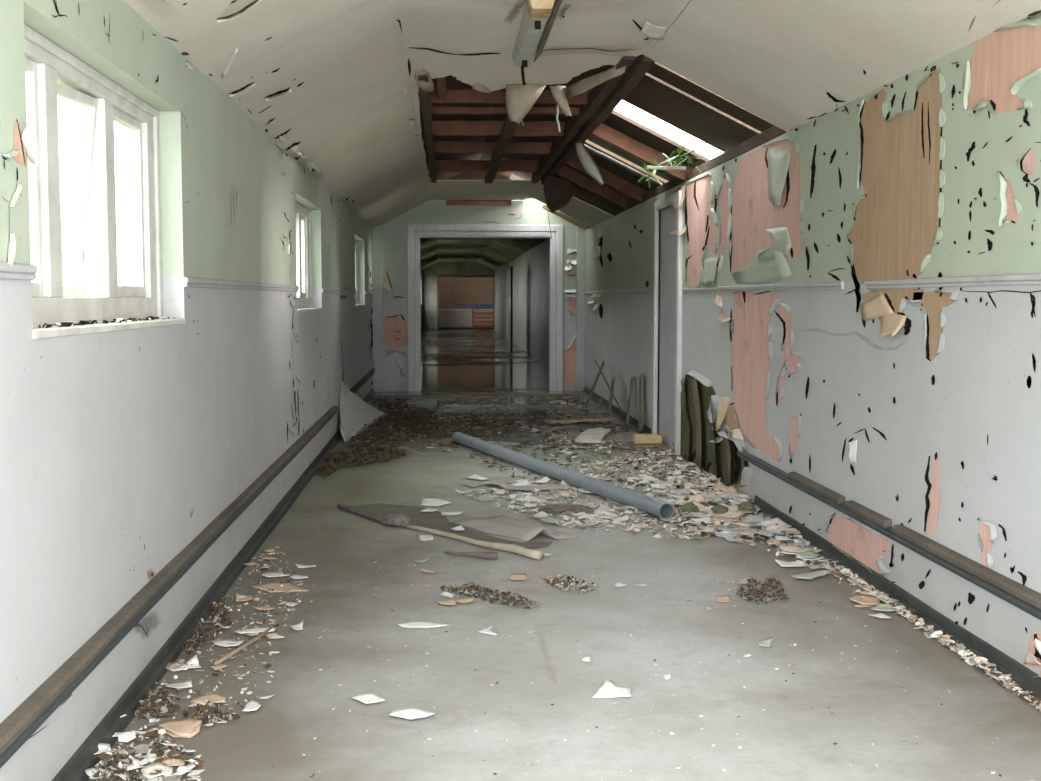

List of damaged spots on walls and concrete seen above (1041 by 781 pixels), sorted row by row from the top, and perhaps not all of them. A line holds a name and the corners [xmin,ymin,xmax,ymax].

peeling [217,0,262,23]
peeling [14,119,38,167]
peeling [564,249,577,276]
peeling [594,229,612,267]
peeling [669,11,1041,463]
peeling [564,289,603,319]
peeling [563,329,576,388]
crack [1027,353,1036,389]
crack [805,377,842,426]
peeling [842,427,887,475]
peeling [632,443,832,579]
peeling [824,513,904,575]